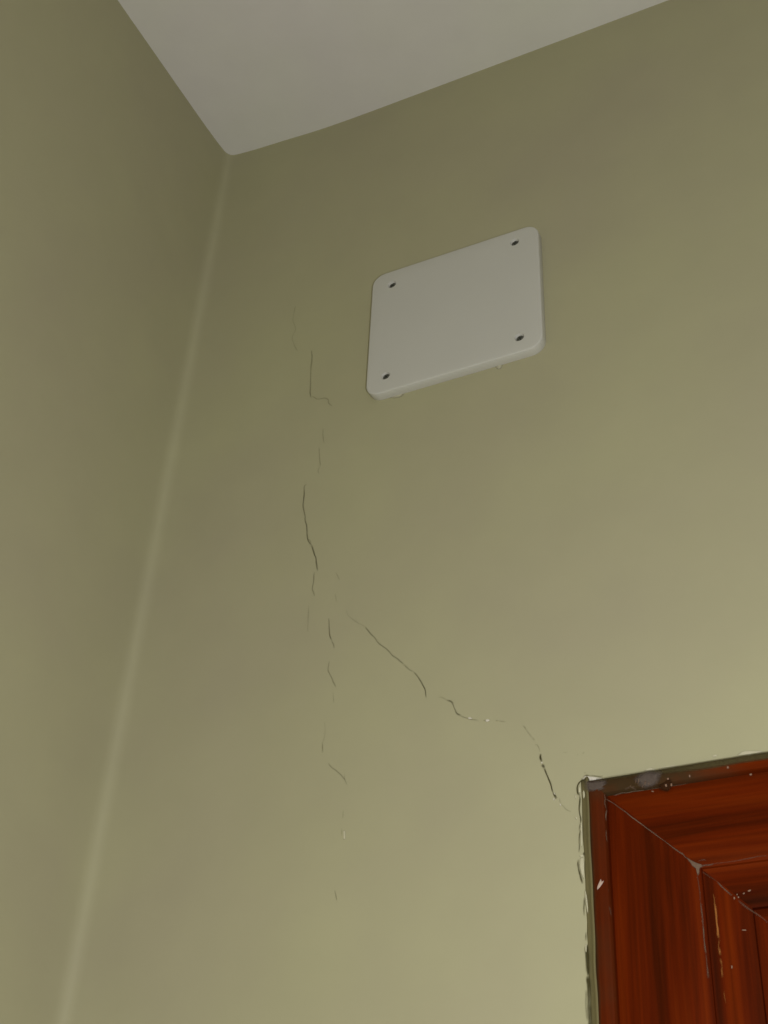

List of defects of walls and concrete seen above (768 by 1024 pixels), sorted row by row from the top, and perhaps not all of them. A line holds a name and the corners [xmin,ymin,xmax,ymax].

crack [539,755,587,903]
crack [584,946,592,1024]